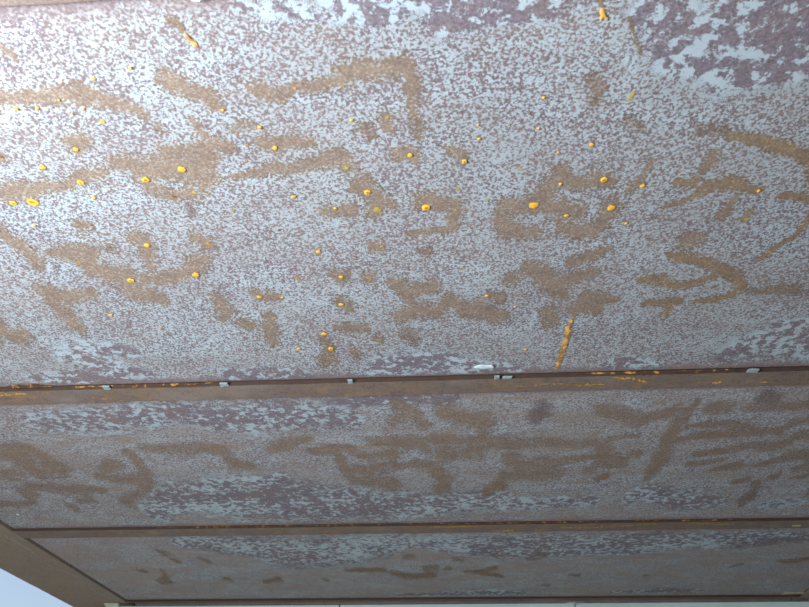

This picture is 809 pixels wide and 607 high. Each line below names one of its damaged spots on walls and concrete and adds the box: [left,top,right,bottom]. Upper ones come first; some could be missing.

corrosion [164,16,198,47]
corrosion [598,0,609,21]
corrosion [244,51,428,166]
corrosion [0,63,398,336]
corrosion [314,151,658,371]
corrosion [0,384,53,397]
corrosion [514,369,735,388]
corrosion [0,439,256,514]
corrosion [265,381,809,506]